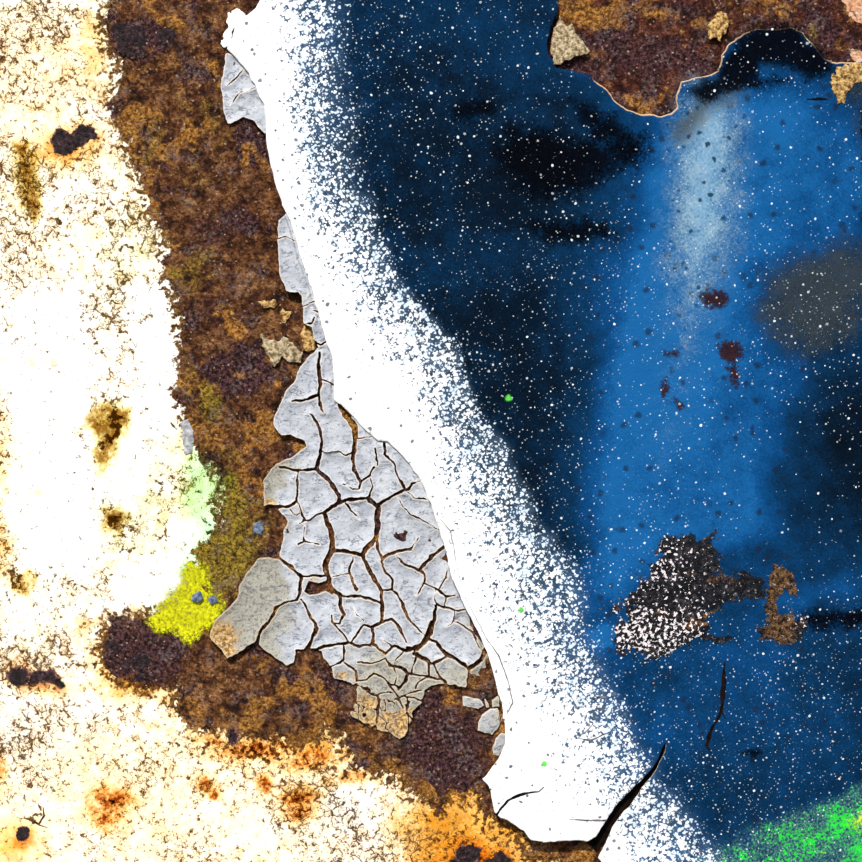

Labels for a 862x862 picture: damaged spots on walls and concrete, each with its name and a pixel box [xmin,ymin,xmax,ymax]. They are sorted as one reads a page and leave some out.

peeling [221,8,266,134]
peeling [550,16,590,65]
rust [547,0,862,116]
peeling [829,63,862,104]
rust [98,0,605,862]
peeling [210,214,505,756]
crack [440,519,513,713]
spalling [599,523,809,666]
rust [5,665,66,689]
crack [705,662,726,753]
rust [16,826,30,844]
crack [569,743,666,851]